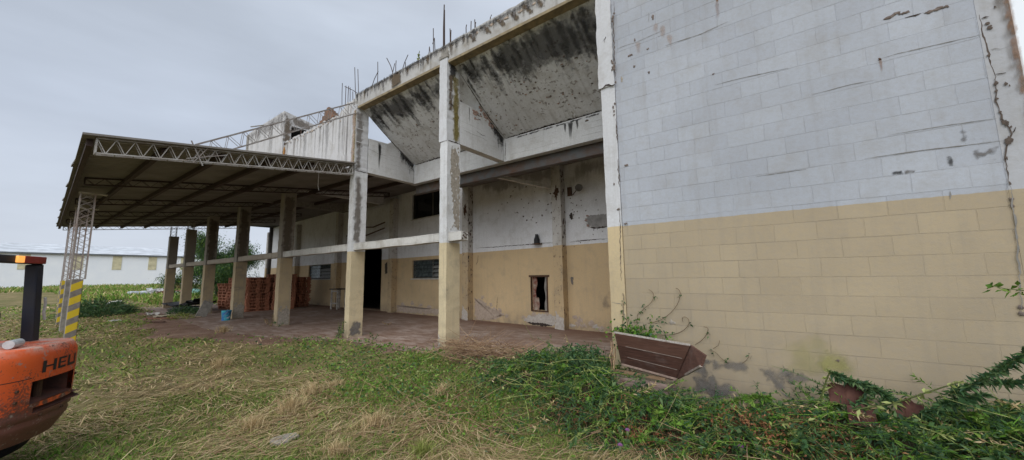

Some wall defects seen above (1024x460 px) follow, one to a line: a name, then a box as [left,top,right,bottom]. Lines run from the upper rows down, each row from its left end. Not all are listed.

leakage [356,0,598,141]
peeling [448,145,607,332]
crack [815,6,1024,316]
leakage [694,360,746,398]